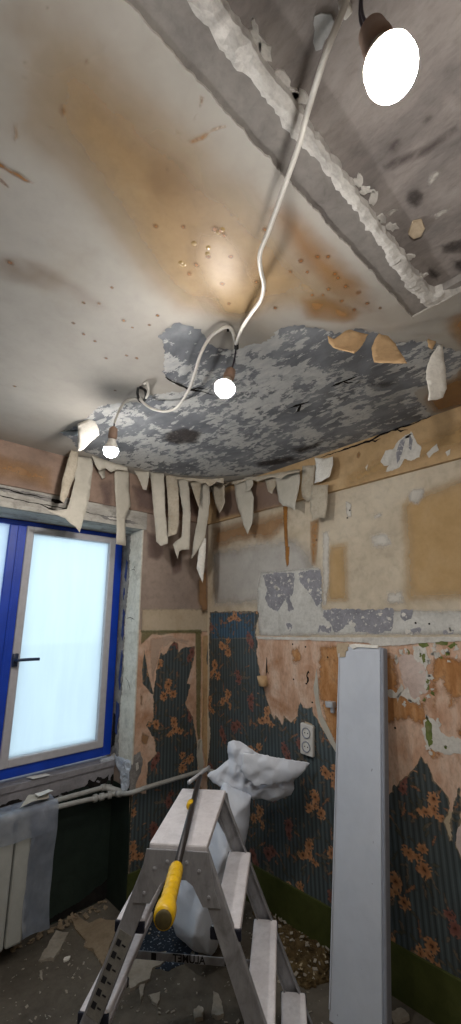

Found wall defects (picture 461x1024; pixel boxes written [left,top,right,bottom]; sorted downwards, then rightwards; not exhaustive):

peeling [249,17,309,104]
peeling [313,13,334,51]
water stain [54,68,351,318]
peeling [353,173,378,206]
peeling [385,219,425,239]
peeling [59,322,461,477]
flaking render [129,630,208,796]
flaking render [255,570,461,818]